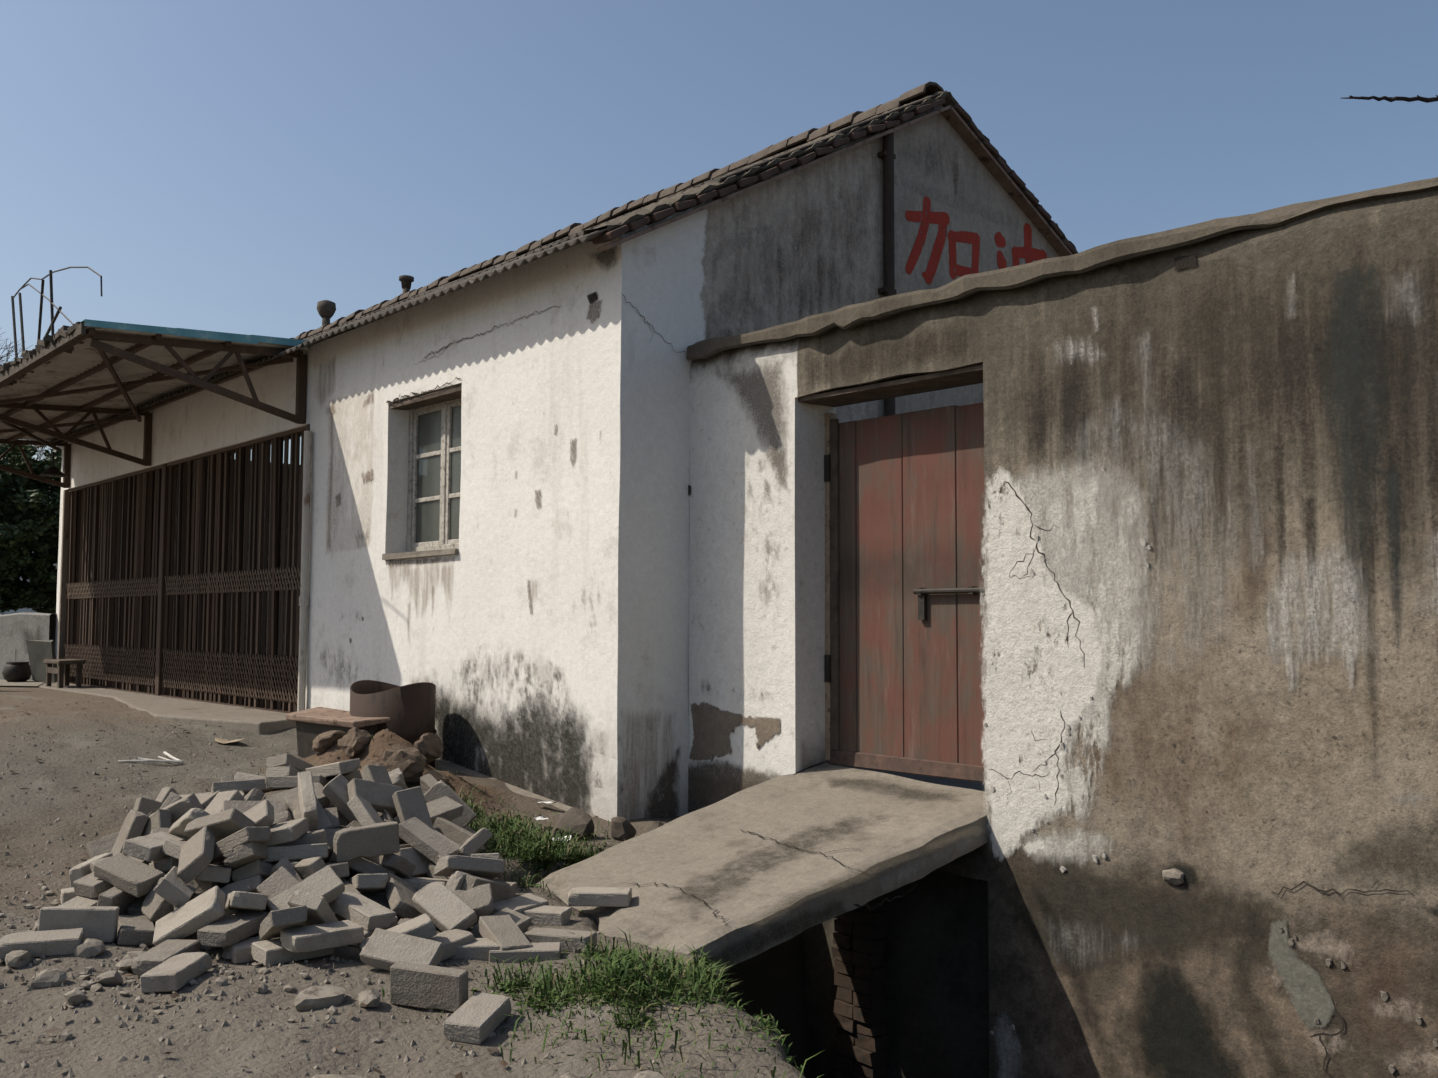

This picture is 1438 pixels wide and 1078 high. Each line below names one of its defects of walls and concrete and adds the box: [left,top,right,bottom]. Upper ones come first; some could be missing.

crack [386,306,561,404]
leakage [731,366,786,484]
leakage [1036,340,1099,459]
leakage [1112,265,1438,686]
crack [1004,481,1085,657]
leakage [435,657,590,811]
peeling [649,685,780,818]
crack [990,710,1065,806]
crack [740,829,879,878]
leakage [1015,863,1285,1078]